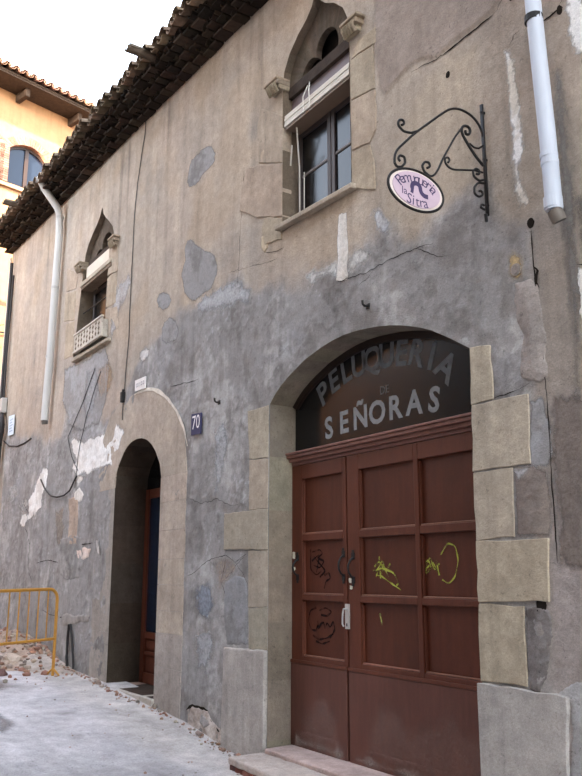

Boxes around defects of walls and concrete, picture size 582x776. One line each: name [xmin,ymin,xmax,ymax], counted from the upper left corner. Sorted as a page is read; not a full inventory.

crack [412,0,502,72]
leakage [566,0,582,53]
leakage [505,51,529,205]
crack [338,243,443,285]
leakage [556,76,582,339]
peeling [9,468,48,526]
peeling [55,424,124,560]
leakage [515,389,582,568]